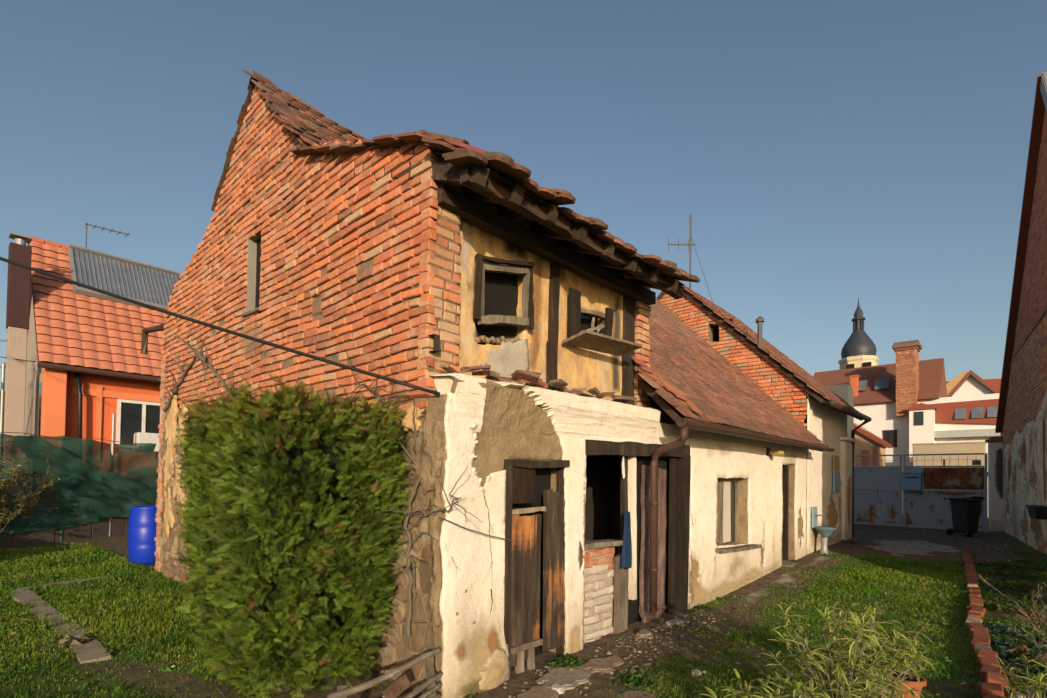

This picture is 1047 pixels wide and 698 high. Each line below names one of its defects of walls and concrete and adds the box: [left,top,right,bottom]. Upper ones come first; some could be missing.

peeling [161,395,189,538]
crack [465,491,493,618]
spalling [470,420,563,492]
peeling [827,497,841,535]
corrosion [889,467,984,525]
peeling [1003,390,1047,553]